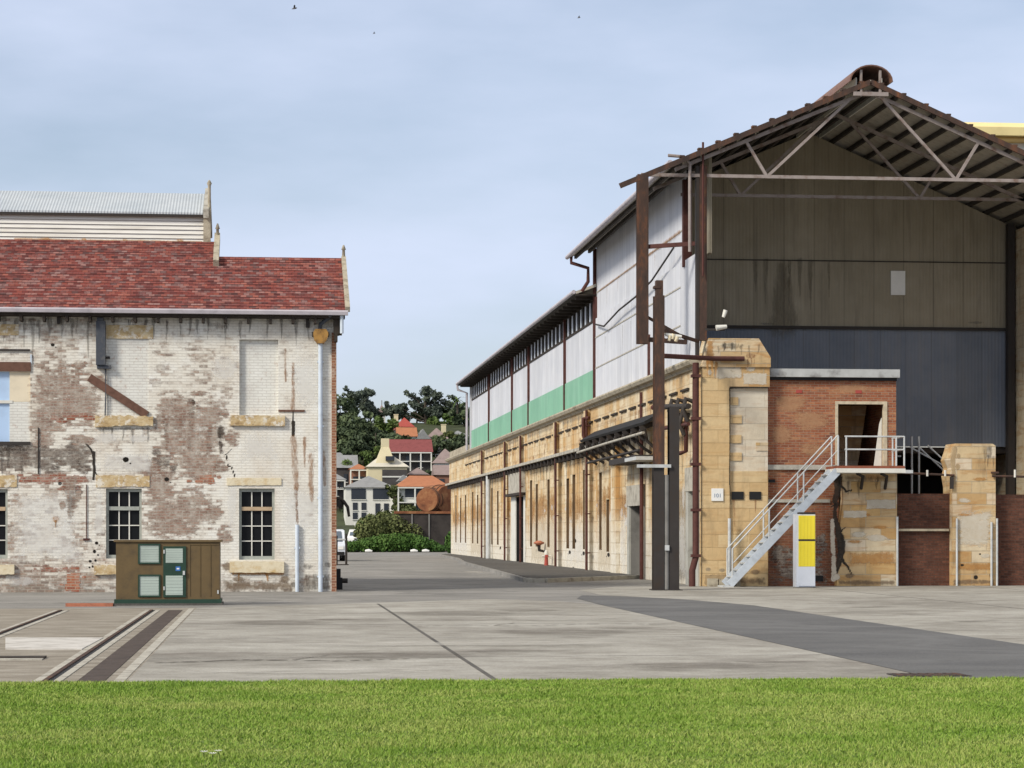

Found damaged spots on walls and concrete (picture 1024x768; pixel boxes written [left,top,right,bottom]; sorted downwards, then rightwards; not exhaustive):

peeling [28,343,107,449]
peeling [17,473,89,516]
peeling [143,391,239,542]
rust [292,437,325,495]
crack [831,474,852,574]